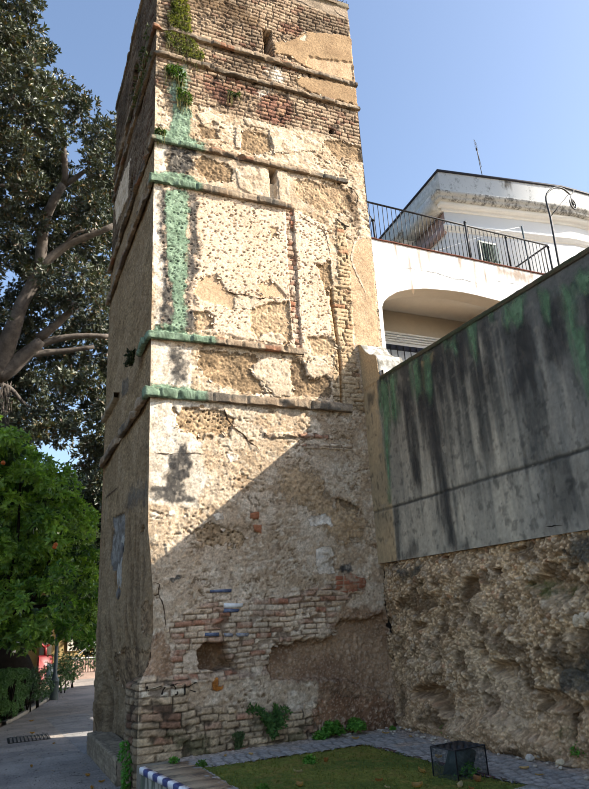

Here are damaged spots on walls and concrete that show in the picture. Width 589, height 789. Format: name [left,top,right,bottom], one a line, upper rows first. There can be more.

flaking render [274,23,358,105]
water stain [164,144,197,175]
water stain [157,191,202,331]
flaking render [193,274,294,346]
flaking render [316,261,333,296]
flaking render [197,336,338,400]
water stain [127,443,196,506]
flaking render [172,405,234,440]
crack [224,409,261,452]
water stain [398,385,421,485]
water stain [419,353,456,547]
crack [383,569,392,633]